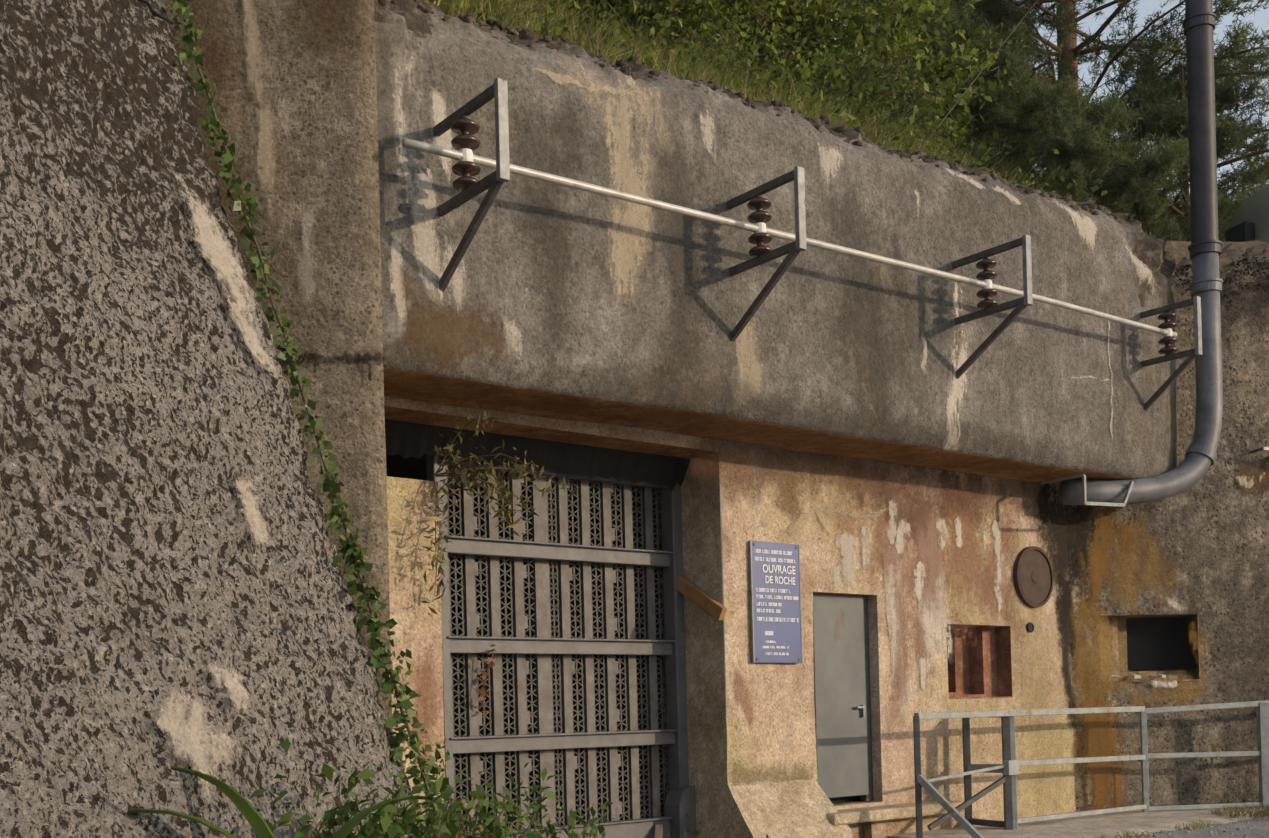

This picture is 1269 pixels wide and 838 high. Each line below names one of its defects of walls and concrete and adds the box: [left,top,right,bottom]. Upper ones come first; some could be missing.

flaking render [176,175,275,371]
rust [872,470,1025,699]
leakage [1037,483,1098,734]
rust [1074,506,1133,810]